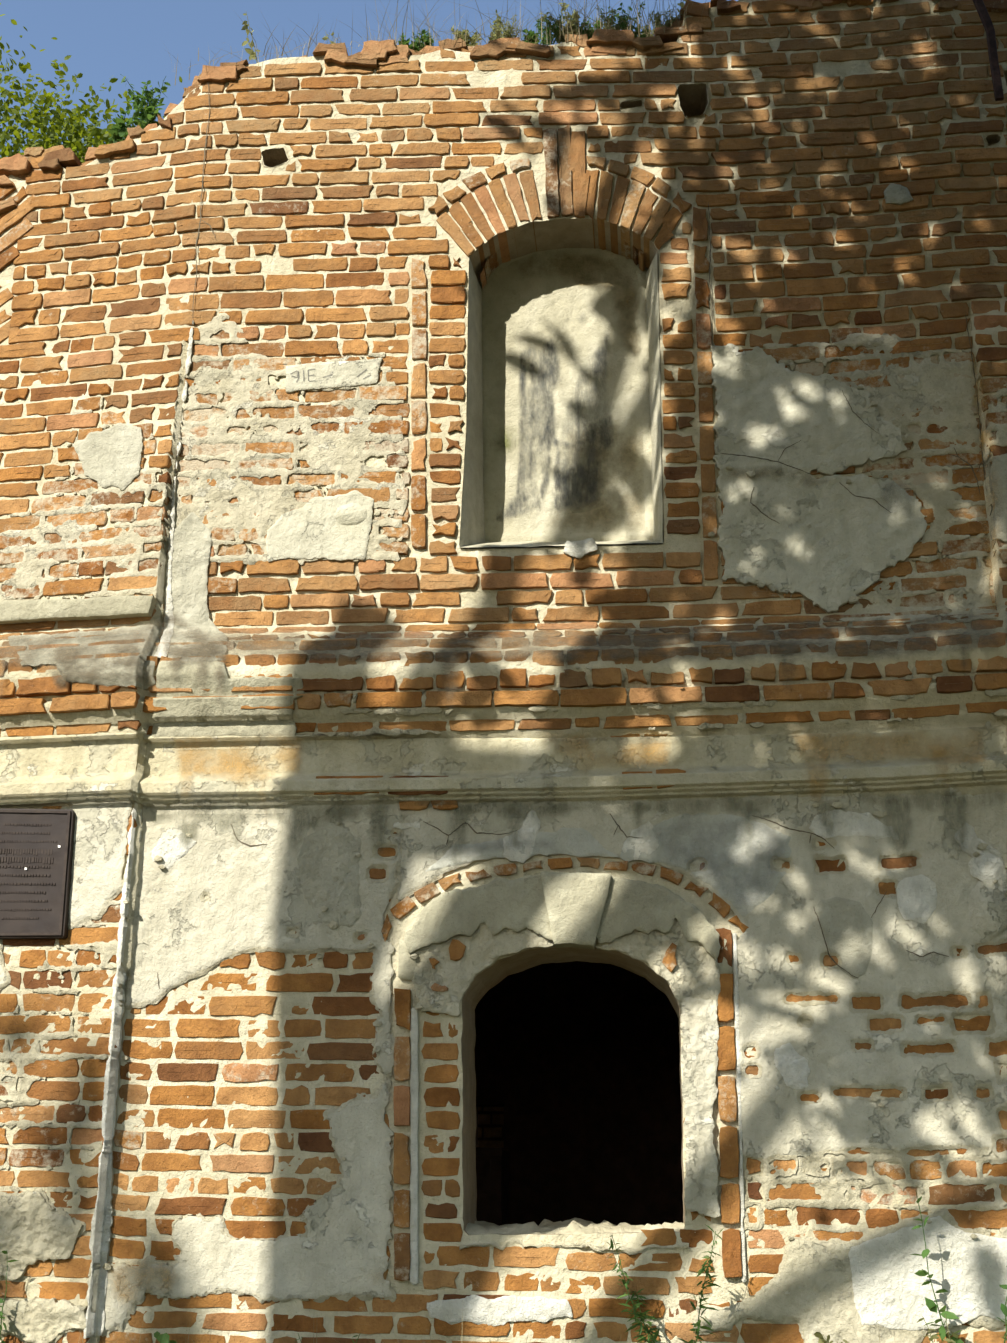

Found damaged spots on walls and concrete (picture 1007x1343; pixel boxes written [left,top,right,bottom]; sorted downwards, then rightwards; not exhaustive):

crack [721,440,891,524]
water stain [0,616,995,693]
flaking render [409,923,554,1017]
flaking render [596,919,721,1007]
flaking render [785,952,803,964]
flaking render [819,952,842,970]
flaking render [949,938,1007,959]
flaking render [0,880,392,1277]
flaking render [0,989,1007,1343]